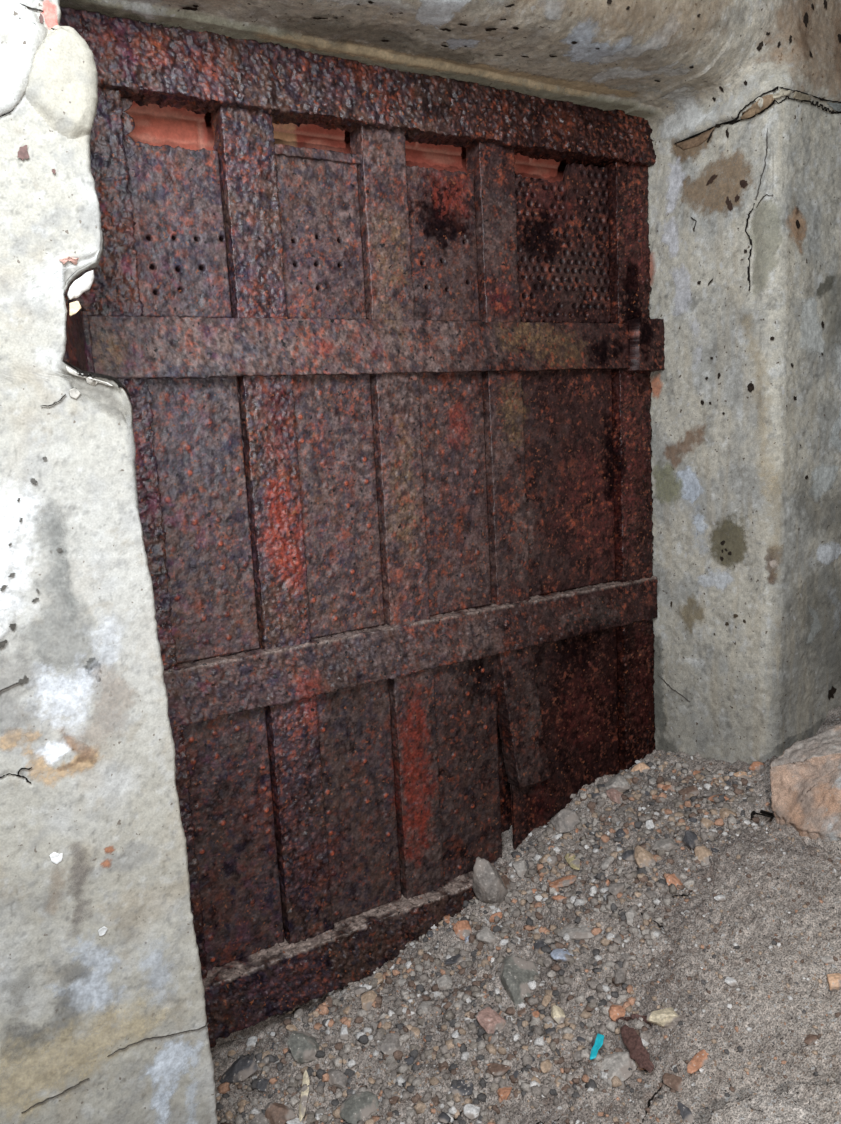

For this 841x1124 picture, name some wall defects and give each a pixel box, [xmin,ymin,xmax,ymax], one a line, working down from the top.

rust [260,34,634,97]
crack [674,86,841,292]
spalling [59,257,99,316]
rust [651,377,662,396]
damp [694,515,747,590]
damp [28,516,109,726]
crack [0,767,32,783]
rust [0,730,97,784]
damp [36,742,70,764]
crack [107,1023,209,1057]
crack [21,1078,89,1113]
damp [147,1042,201,1124]